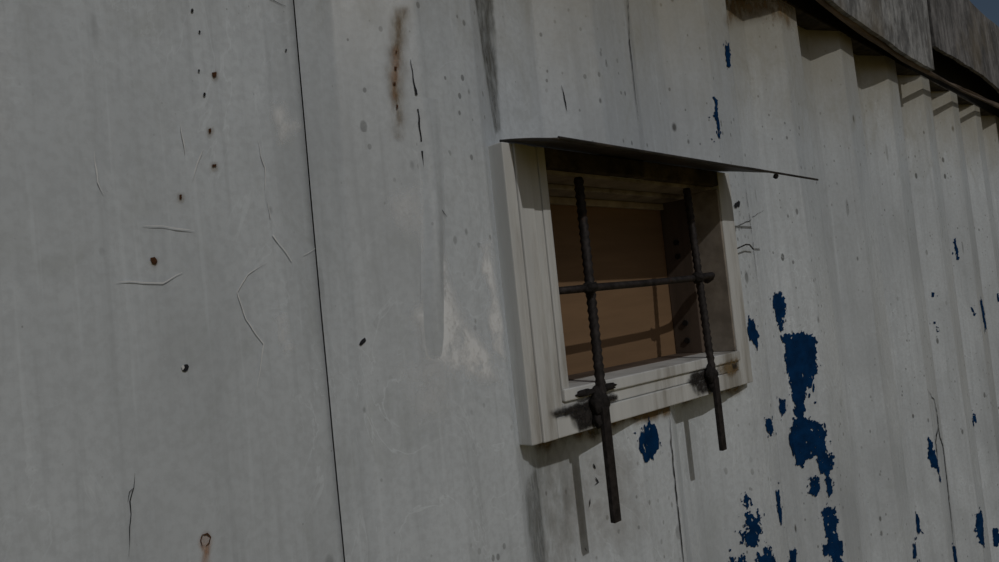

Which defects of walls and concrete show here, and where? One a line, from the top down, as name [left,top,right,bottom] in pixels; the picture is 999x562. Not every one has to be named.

corrosion [393,16,401,109]
peeling [748,318,760,353]
peeling [634,418,662,462]
peeling [764,291,844,562]
peeling [927,437,941,482]
peeling [728,491,776,562]